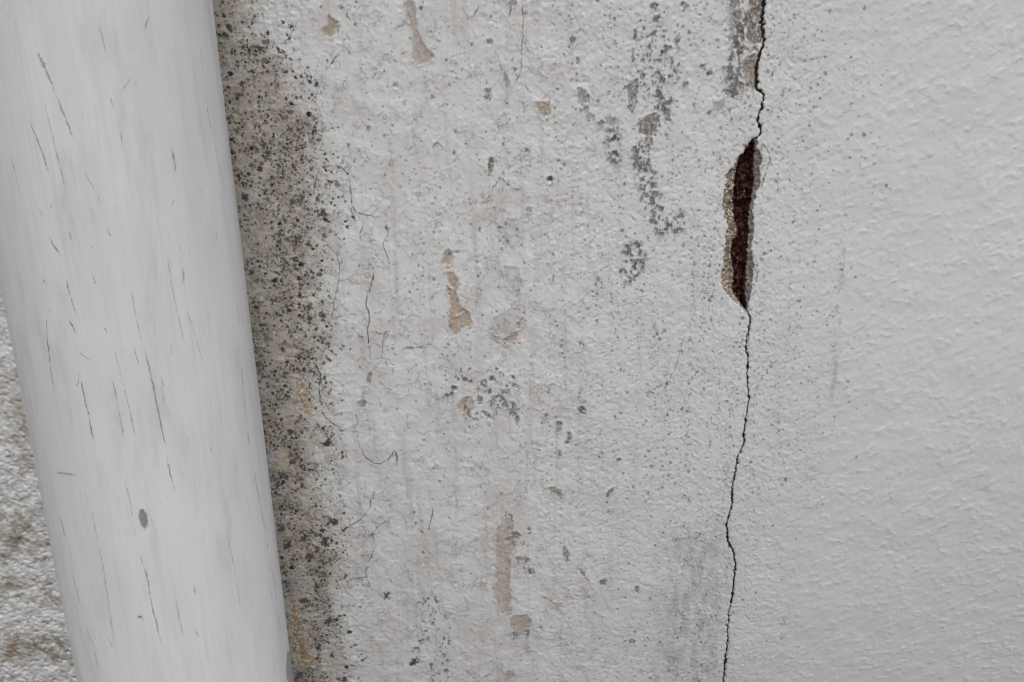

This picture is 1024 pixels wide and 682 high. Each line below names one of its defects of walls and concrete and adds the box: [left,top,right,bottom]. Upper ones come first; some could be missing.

peeling [395,0,434,65]
crack [754,0,771,186]
leakage [212,0,419,682]
peeling [441,247,473,338]
spalling [720,138,762,313]
peeling [492,514,535,640]
crack [722,308,751,682]